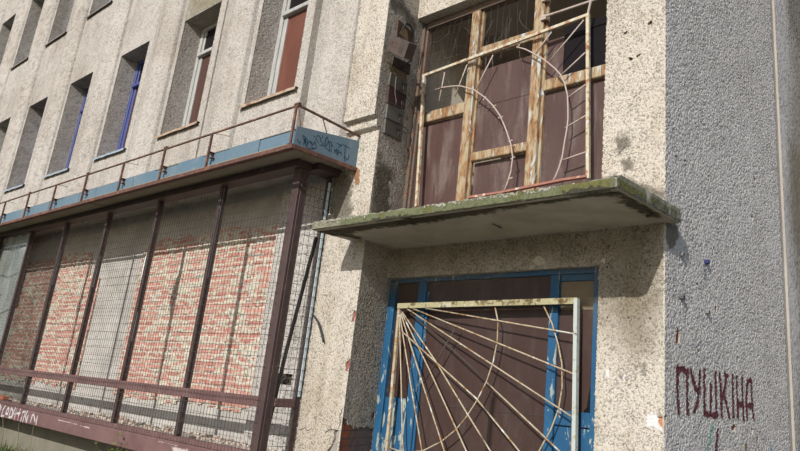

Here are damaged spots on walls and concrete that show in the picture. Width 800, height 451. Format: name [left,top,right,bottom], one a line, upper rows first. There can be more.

leakage [317,164,679,248]
spalling [327,411,375,451]